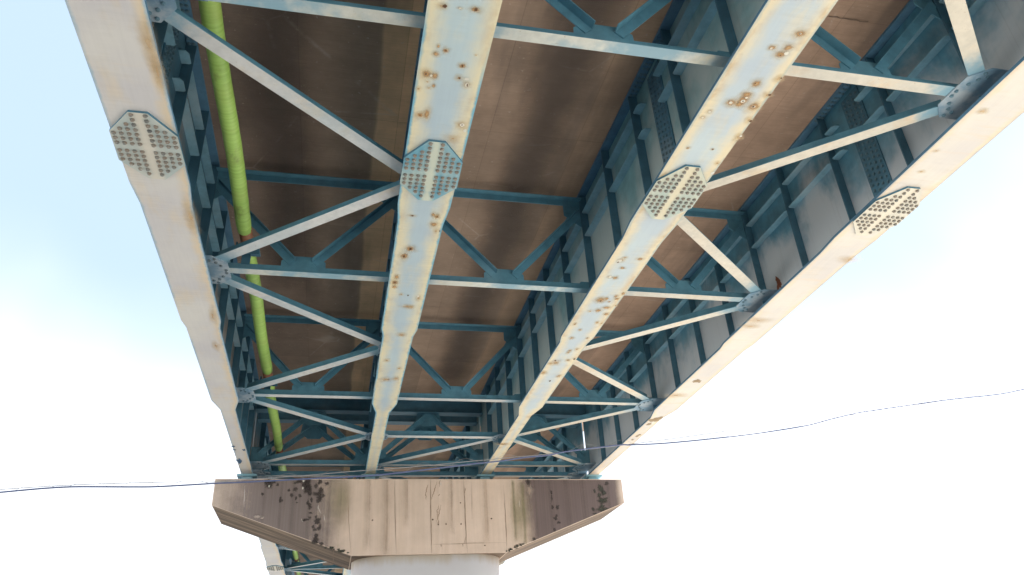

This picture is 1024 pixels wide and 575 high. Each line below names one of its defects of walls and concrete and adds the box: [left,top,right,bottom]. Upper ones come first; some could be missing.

corrosion [728,82,771,122]